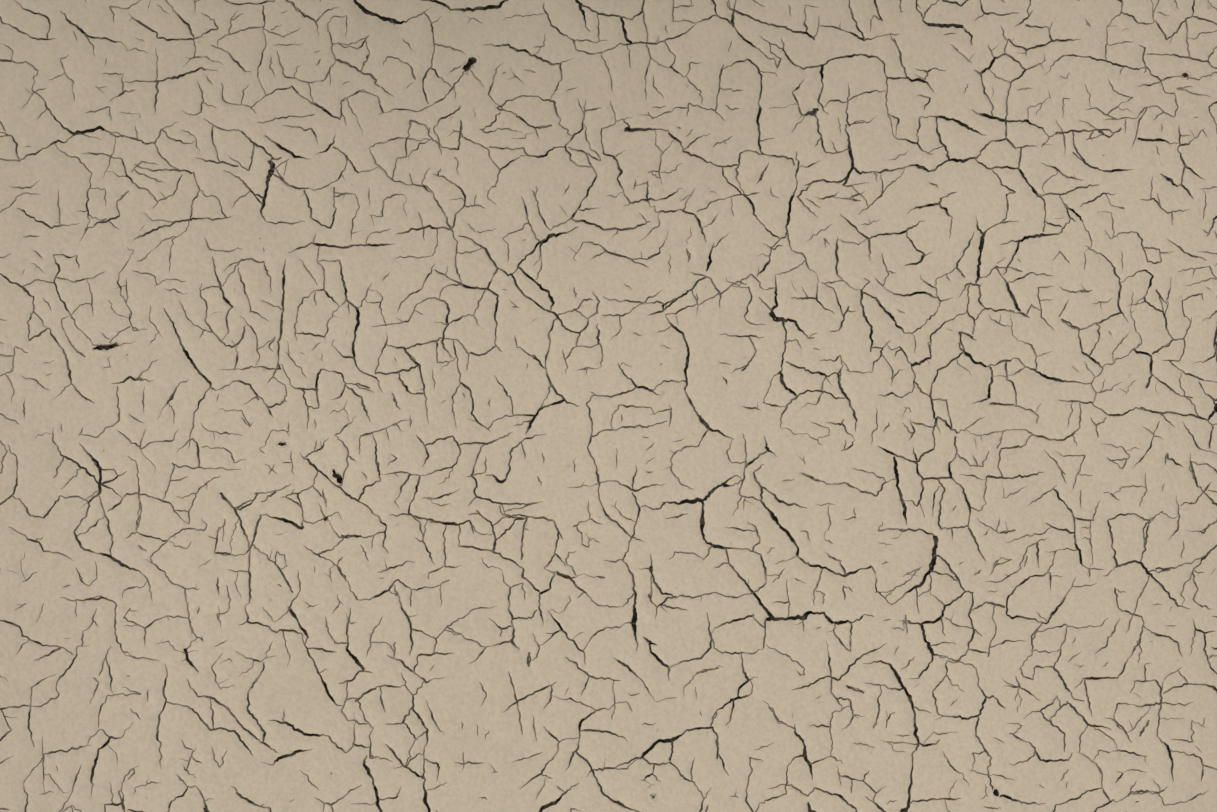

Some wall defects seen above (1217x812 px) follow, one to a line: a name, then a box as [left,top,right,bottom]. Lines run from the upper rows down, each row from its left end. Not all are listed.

crack [975,0,1020,21]
crack [257,114,318,143]
crack [907,192,956,238]
crack [1141,176,1190,224]
crack [569,234,671,274]
crack [720,333,764,384]
crack [1045,451,1093,489]
crack [1105,443,1139,469]
crack [1165,453,1183,467]
crack [573,500,600,548]
crack [977,518,1016,535]
crack [231,786,295,812]